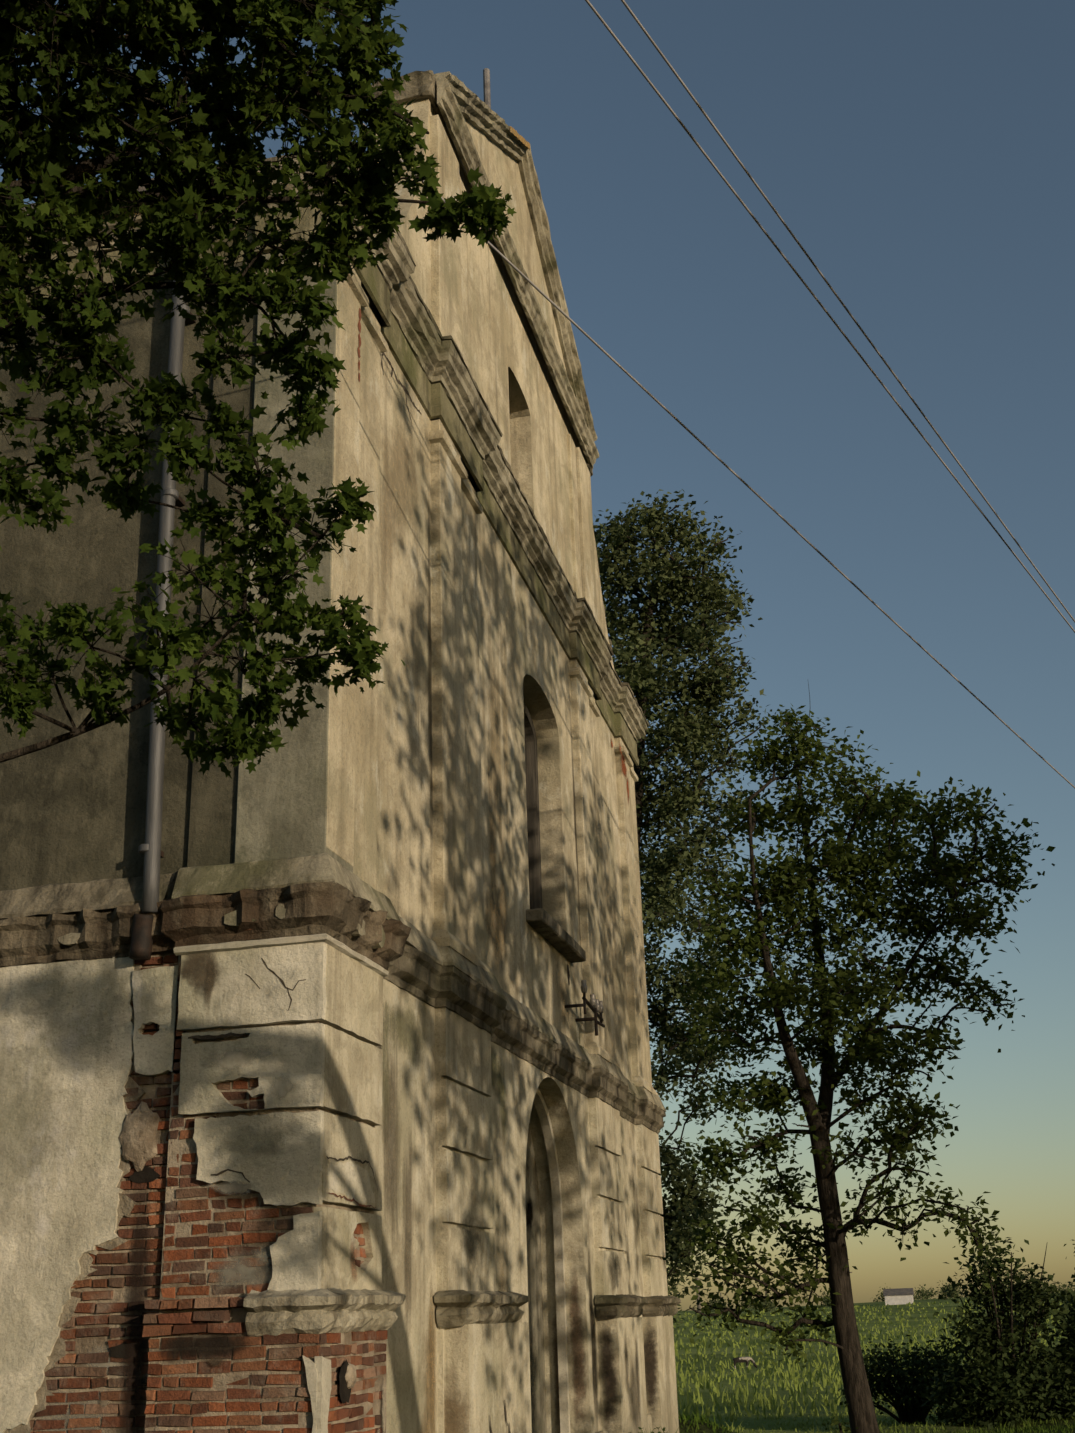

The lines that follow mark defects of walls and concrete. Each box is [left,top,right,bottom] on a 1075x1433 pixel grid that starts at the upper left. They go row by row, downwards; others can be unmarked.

crack [245,958,306,1010]
flaking render [30,954,388,1433]
water stain [609,1253,620,1286]
water stain [588,1262,658,1429]